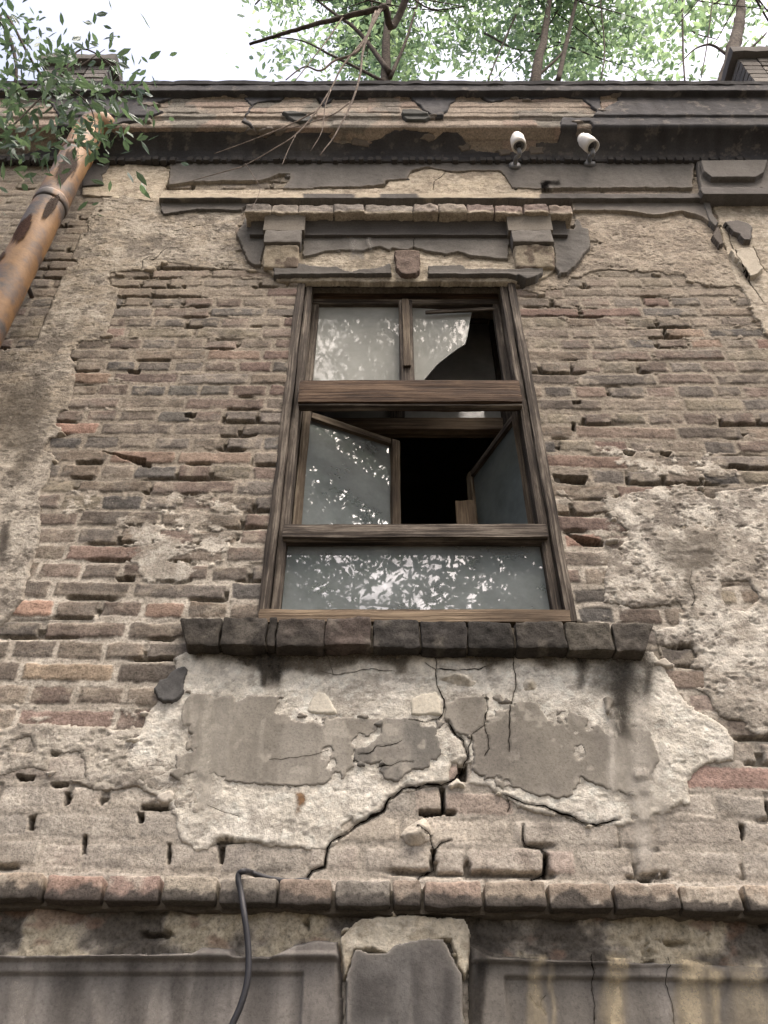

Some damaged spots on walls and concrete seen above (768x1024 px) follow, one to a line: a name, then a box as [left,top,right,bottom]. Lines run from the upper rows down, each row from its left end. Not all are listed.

peeling [0,92,768,626]
damp [195,652,420,686]
flaking render [0,483,768,852]
crack [306,659,516,879]
damp [455,654,515,668]
crack [503,794,618,881]
damp [534,653,653,865]
flaking render [340,912,471,981]